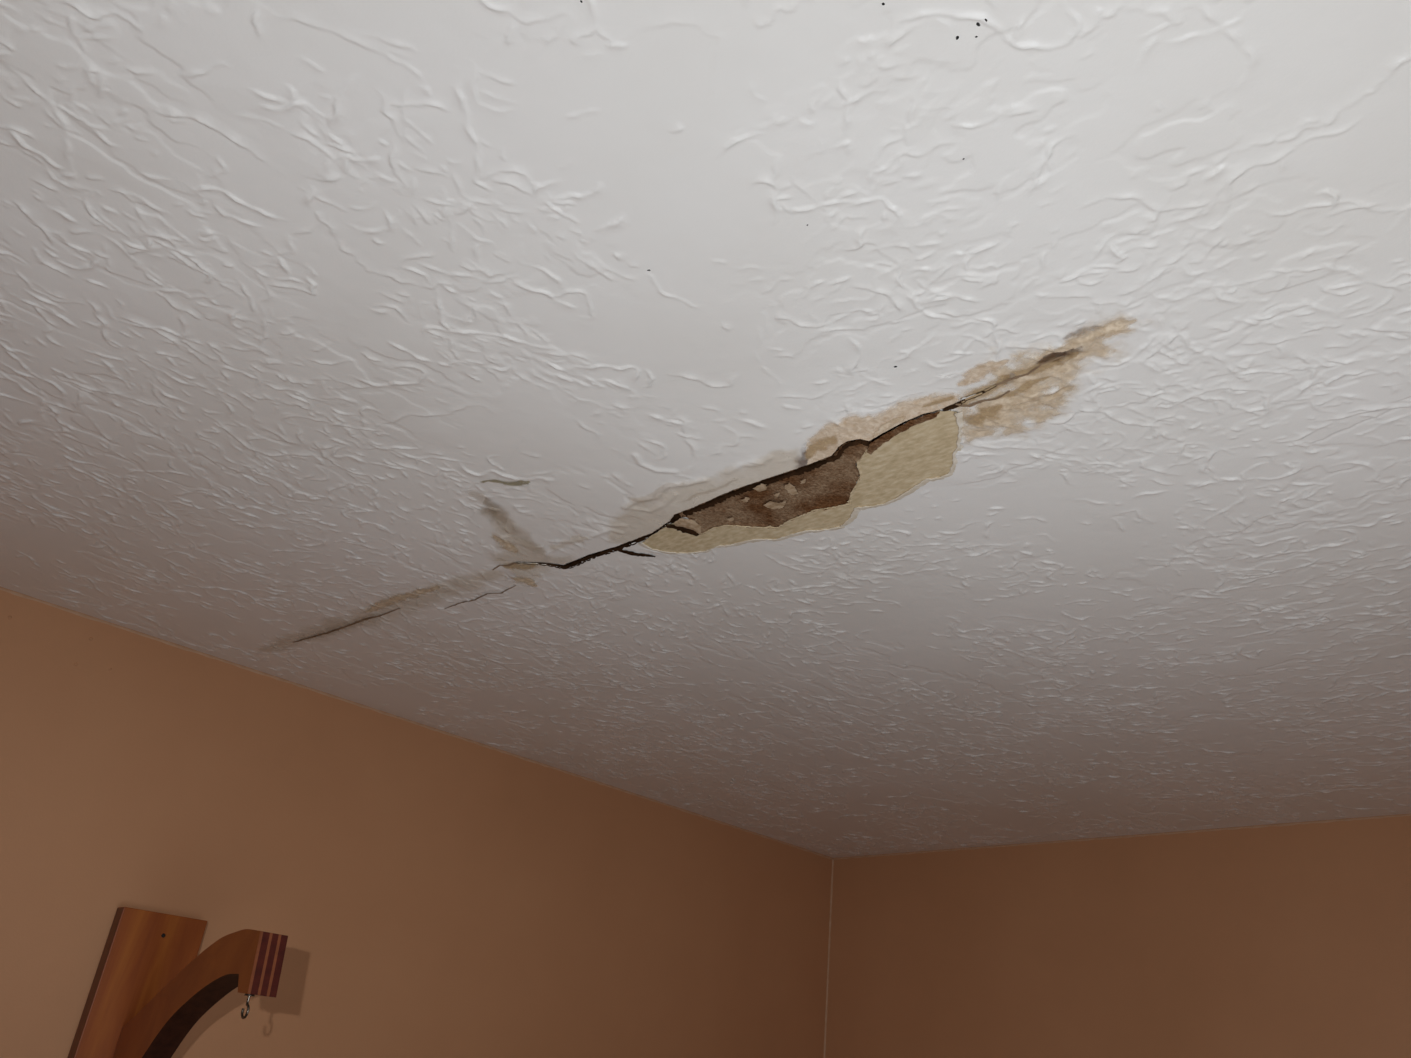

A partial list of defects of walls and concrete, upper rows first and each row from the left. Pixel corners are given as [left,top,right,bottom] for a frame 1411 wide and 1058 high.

leakage [805,320,1135,465]
crack [445,356,1062,609]
peeling [638,411,964,554]
crack [293,608,401,643]